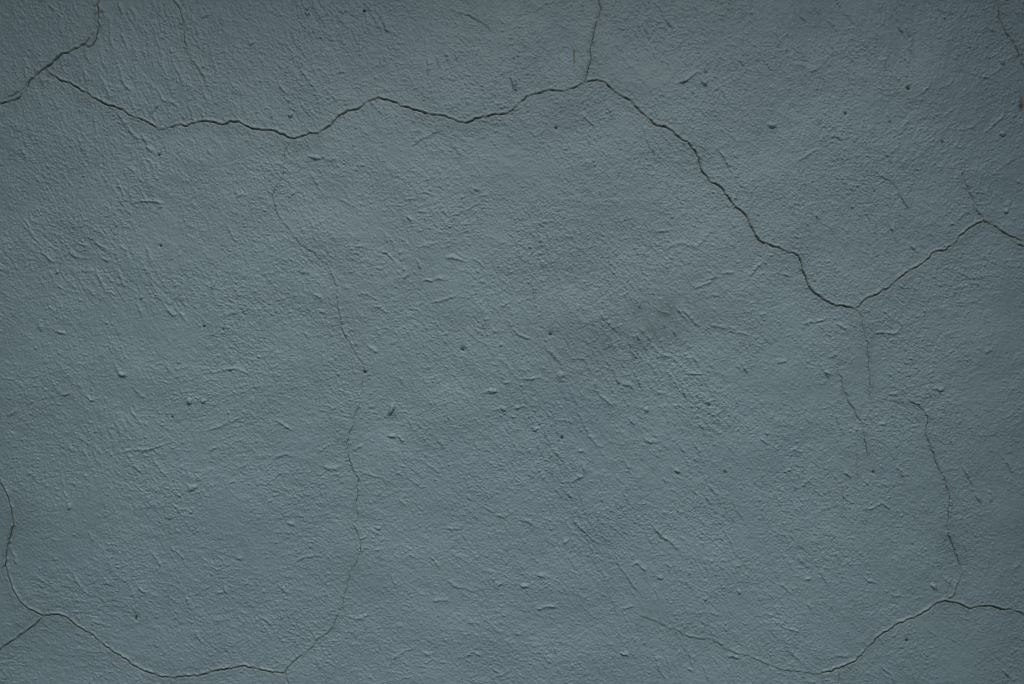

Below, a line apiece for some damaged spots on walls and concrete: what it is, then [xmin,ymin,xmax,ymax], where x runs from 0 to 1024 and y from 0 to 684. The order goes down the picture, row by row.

crack [2,1,1024,475]
crack [0,301,365,684]
crack [820,401,1024,684]